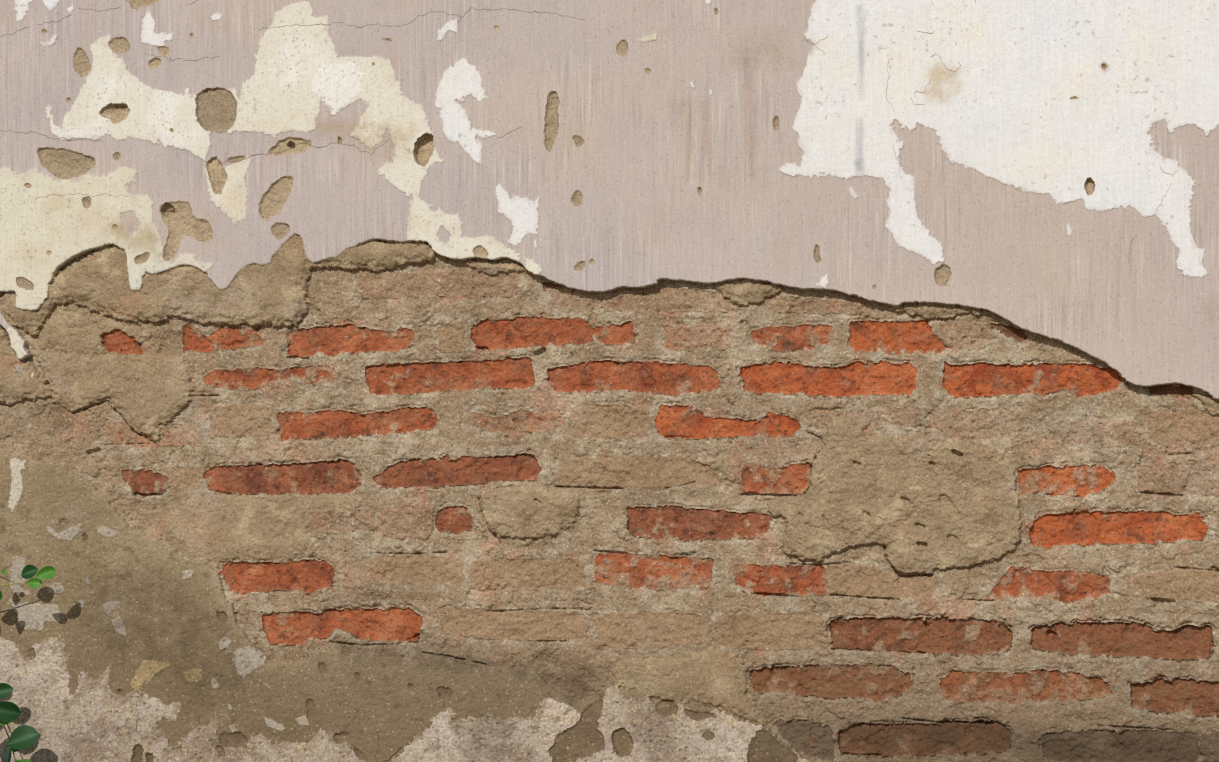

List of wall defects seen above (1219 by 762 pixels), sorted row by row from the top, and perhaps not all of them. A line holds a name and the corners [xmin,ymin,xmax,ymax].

peeling [15,0,73,21]
peeling [0,147,213,310]
peeling [45,0,521,263]
peeling [495,183,539,246]
flaking render [571,190,583,206]
peeling [773,0,1219,286]
spalling [0,235,1219,762]